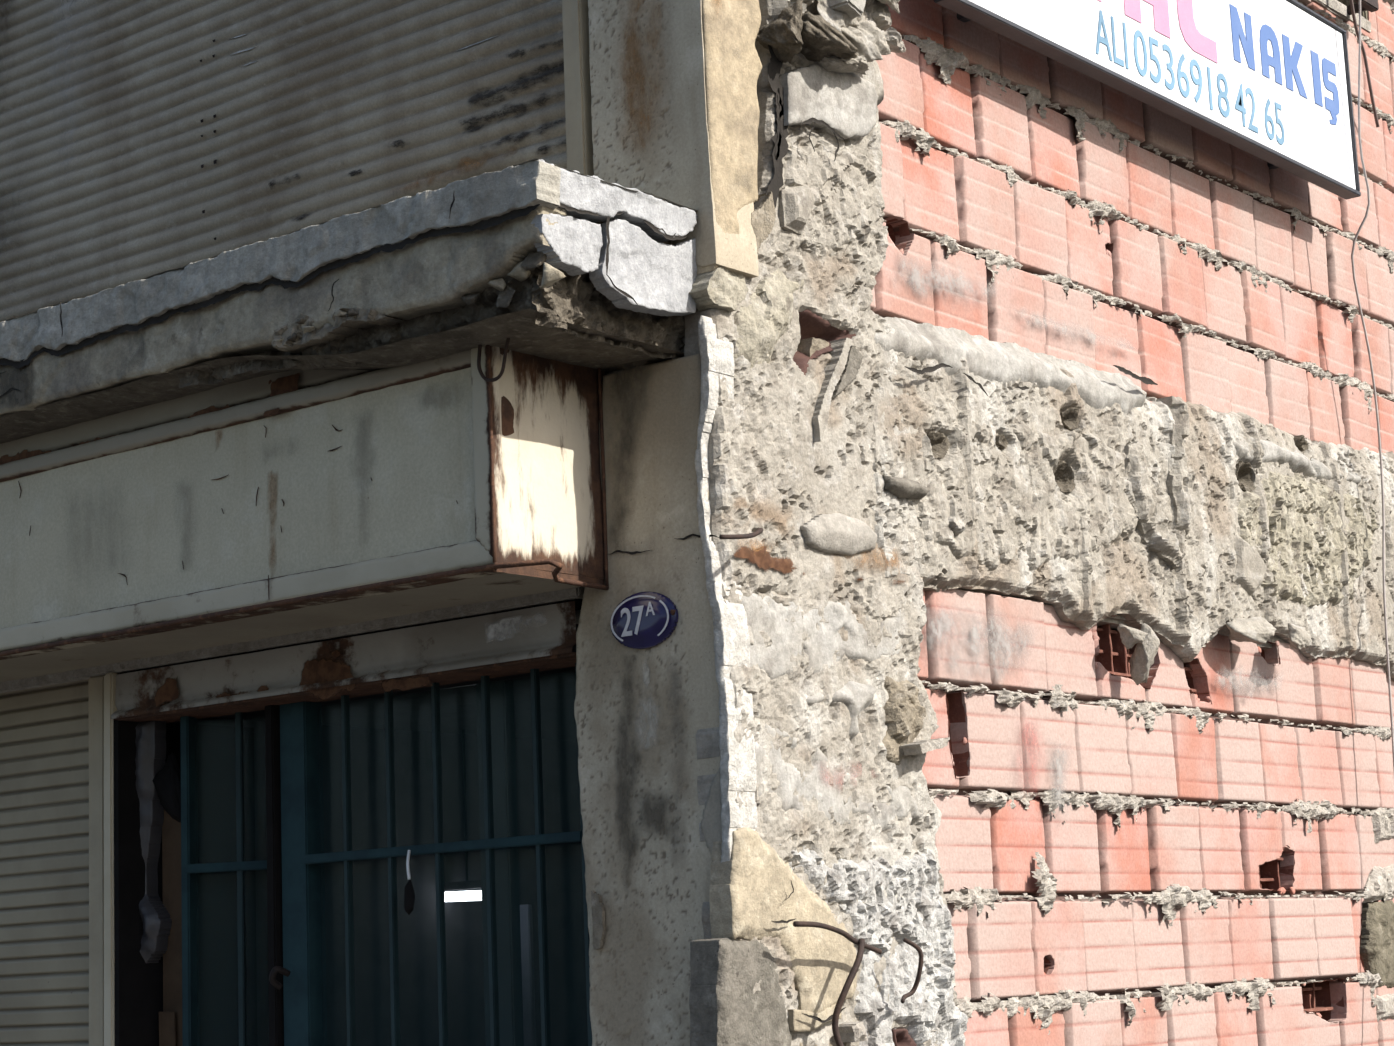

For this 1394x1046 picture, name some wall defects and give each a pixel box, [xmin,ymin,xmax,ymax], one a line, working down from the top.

spalling [751,148,910,257]
crack [0,193,687,398]
spalling [882,420,1139,571]
spalling [1231,471,1394,607]
spalling [178,252,970,1046]
spalling [1092,624,1160,690]
spalling [1183,660,1212,704]
spalling [1257,640,1281,665]
water stain [617,663,666,860]
spalling [1259,845,1296,895]